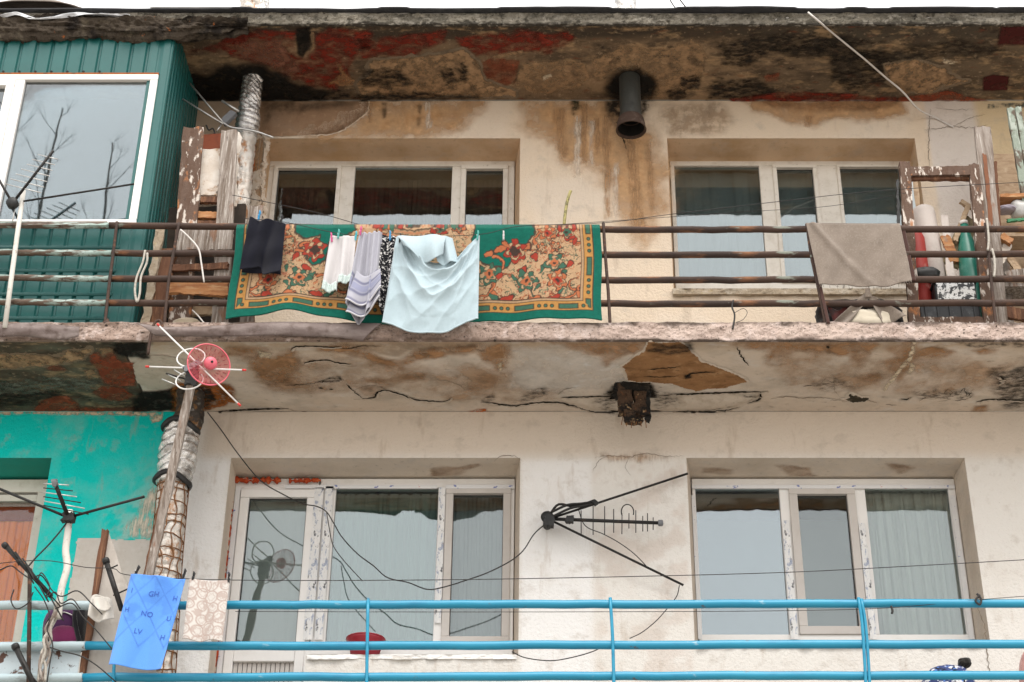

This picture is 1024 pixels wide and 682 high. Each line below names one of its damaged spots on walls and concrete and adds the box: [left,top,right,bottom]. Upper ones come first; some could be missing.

peeling [998,26,1024,45]
spalling [203,29,574,102]
spalling [592,39,706,100]
spalling [731,57,1024,108]
water stain [751,101,906,125]
water stain [523,101,670,239]
water stain [228,347,328,391]
water stain [320,344,510,400]
crack [290,345,614,413]
spalling [620,340,750,393]
crack [659,379,844,413]
water stain [748,342,877,369]